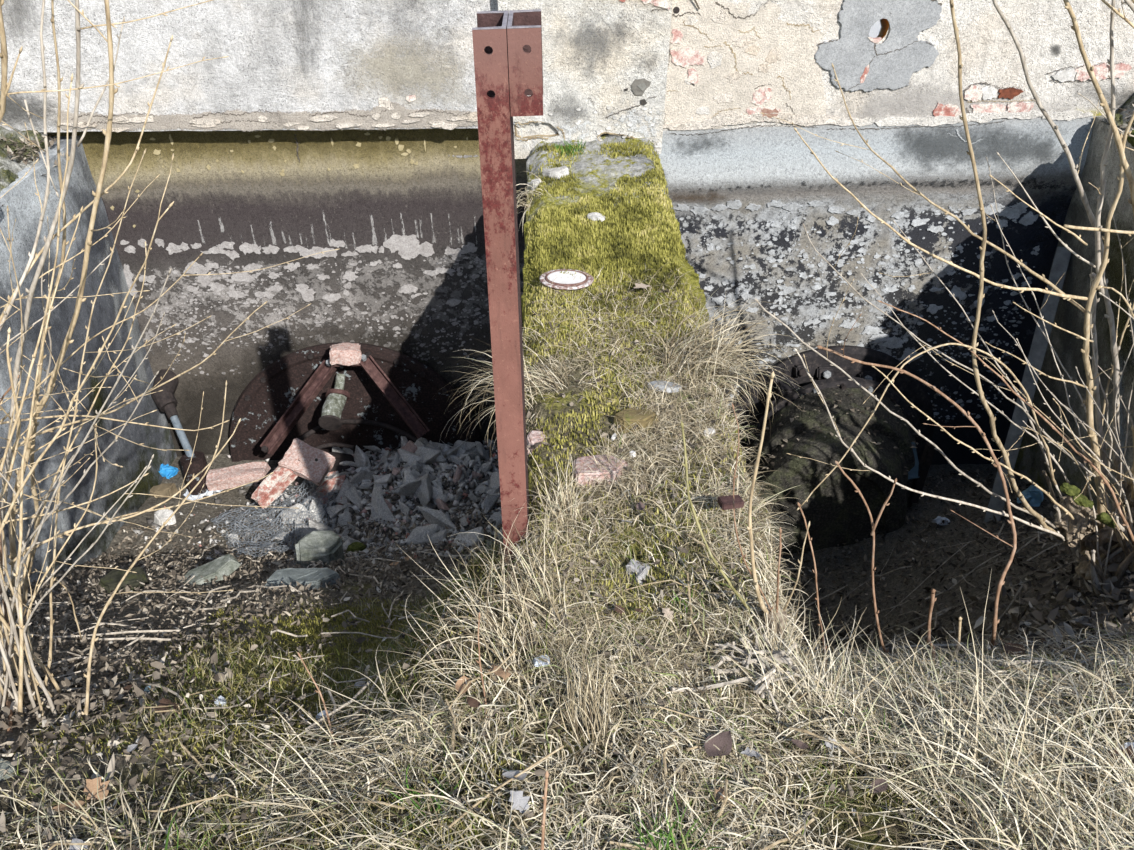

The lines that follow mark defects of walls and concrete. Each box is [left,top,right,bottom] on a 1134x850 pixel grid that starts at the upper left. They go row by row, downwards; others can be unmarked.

flaking render [642,0,1093,131]
flaking render [1046,62,1132,82]
flaking render [624,78,651,105]
damp [269,212,356,249]
damp [371,213,436,245]
peeling [120,225,490,376]
peeling [673,199,1040,419]